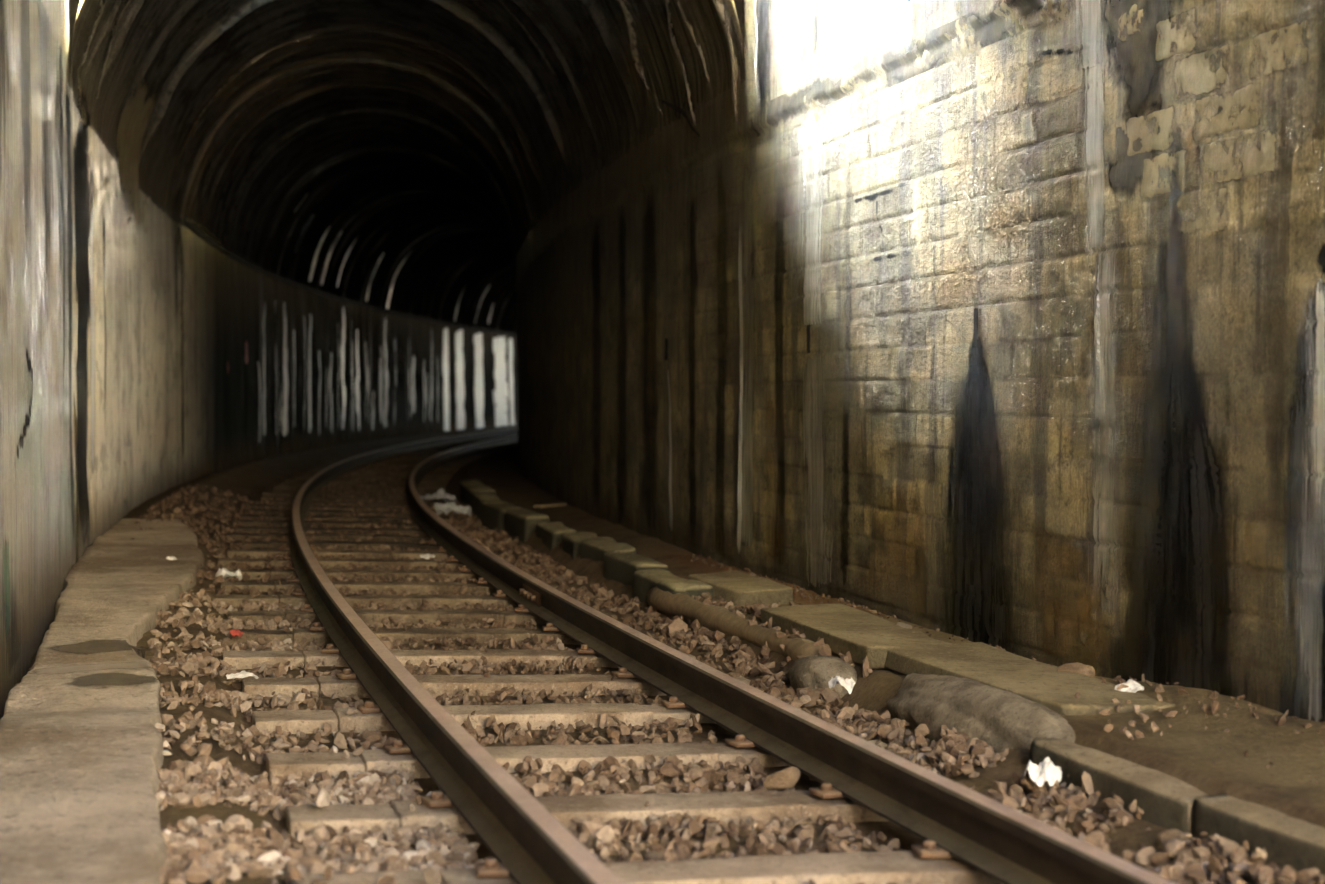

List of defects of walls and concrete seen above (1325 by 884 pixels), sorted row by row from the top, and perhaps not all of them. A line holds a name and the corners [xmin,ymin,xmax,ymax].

damp [618,0,649,89]
damp [666,0,709,126]
damp [712,0,771,129]
damp [943,308,1020,652]
damp [1076,0,1235,696]
damp [1281,244,1325,724]